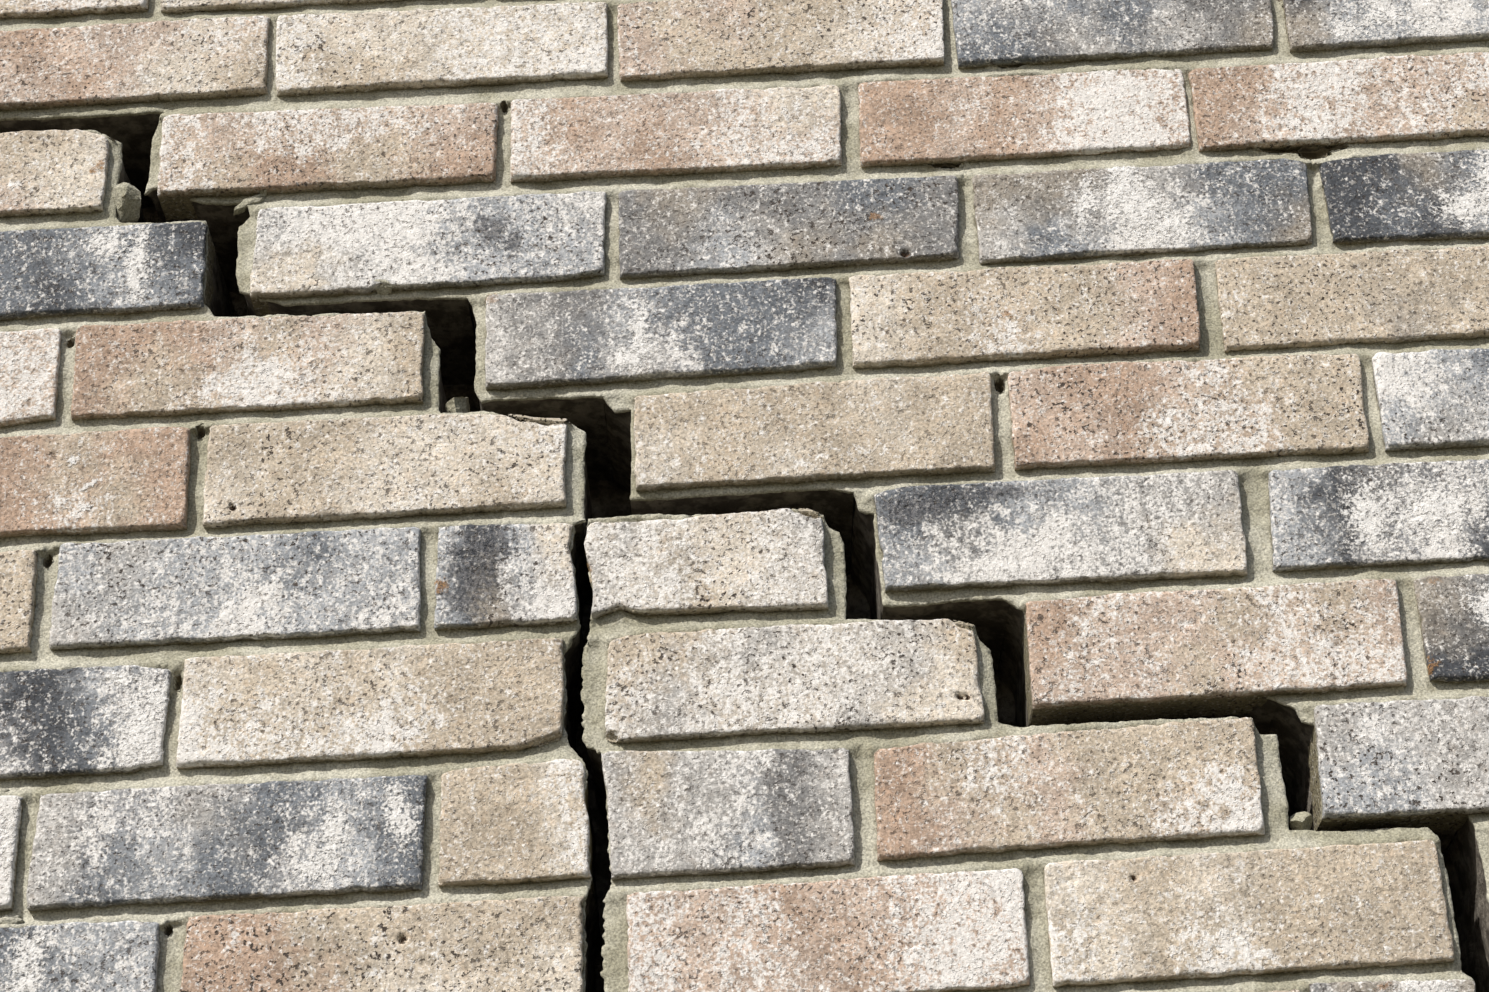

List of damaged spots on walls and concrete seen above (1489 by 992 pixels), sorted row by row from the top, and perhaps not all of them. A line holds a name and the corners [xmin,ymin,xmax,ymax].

crack [0,114,1032,992]
crack [1168,699,1314,830]
crack [1432,819,1489,992]